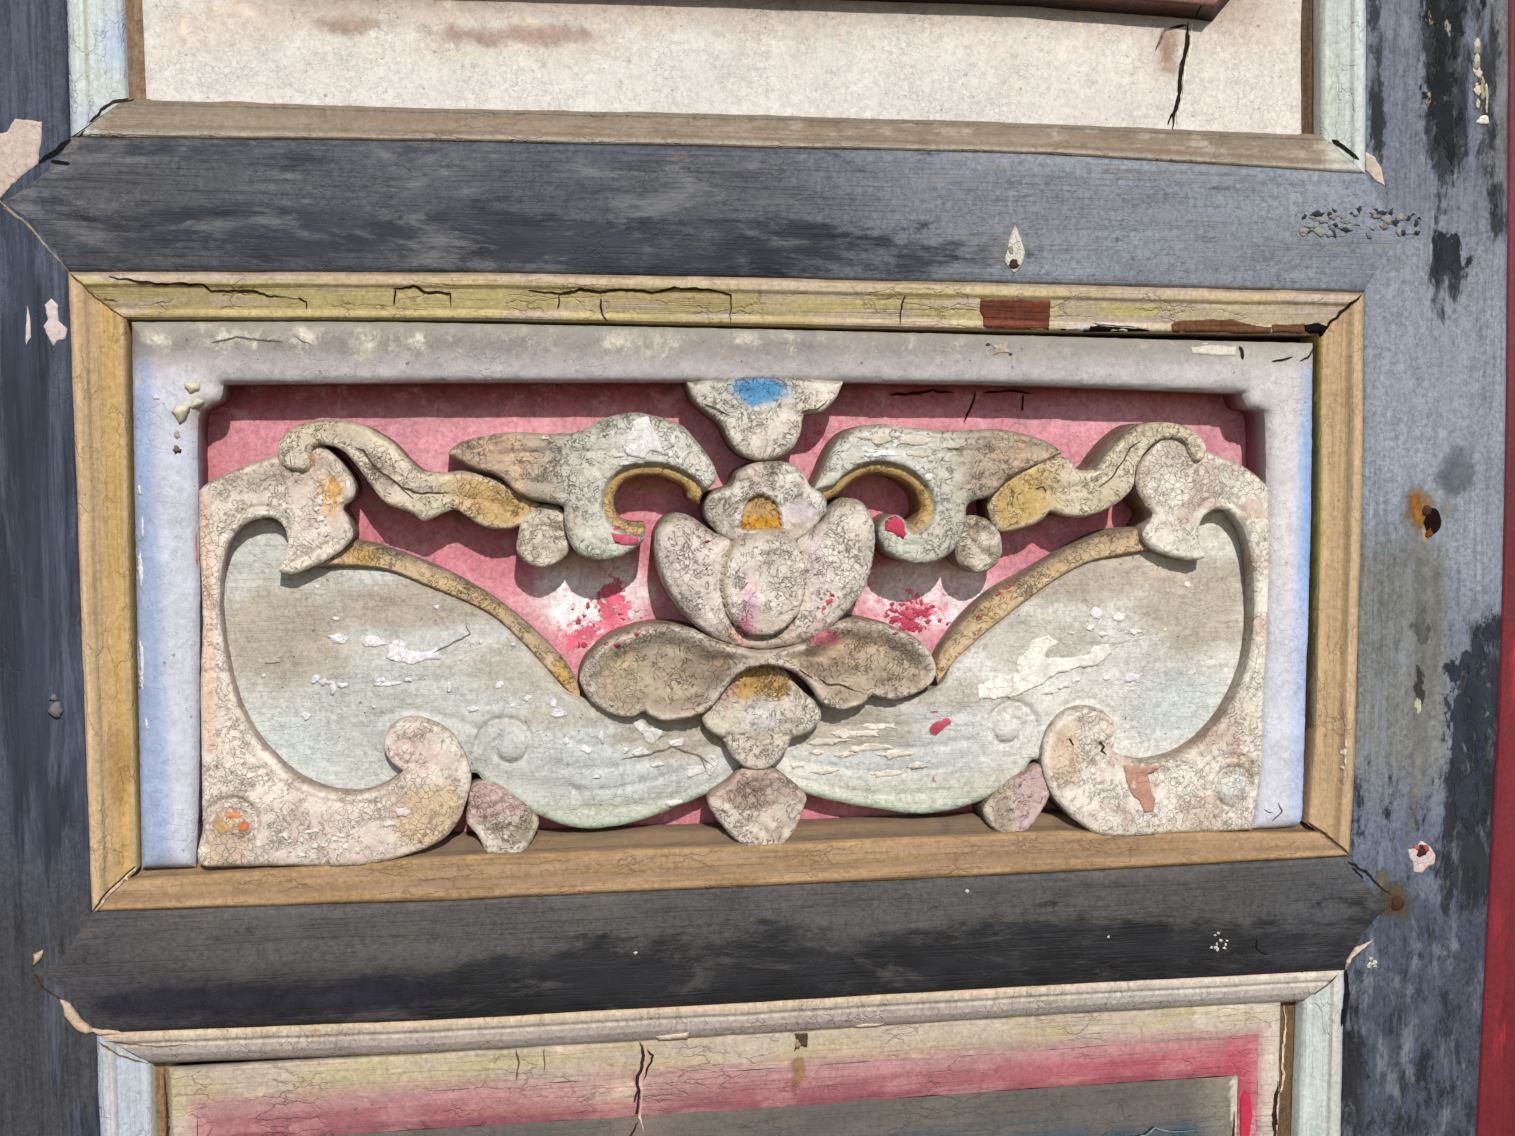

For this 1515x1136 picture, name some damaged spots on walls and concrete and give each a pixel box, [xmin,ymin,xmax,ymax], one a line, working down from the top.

crack [1155,5,1202,130]
peeling [0,119,42,201]
peeling [1299,206,1473,289]
crack [393,285,451,305]
crack [529,286,732,324]
corrosion [1405,490,1453,543]
peeling [977,607,1143,700]
peeling [1124,764,1166,813]
peeling [1407,841,1436,874]
crack [629,1042,654,1136]
crack [1135,1111,1235,1136]
crack [1272,970,1350,1136]